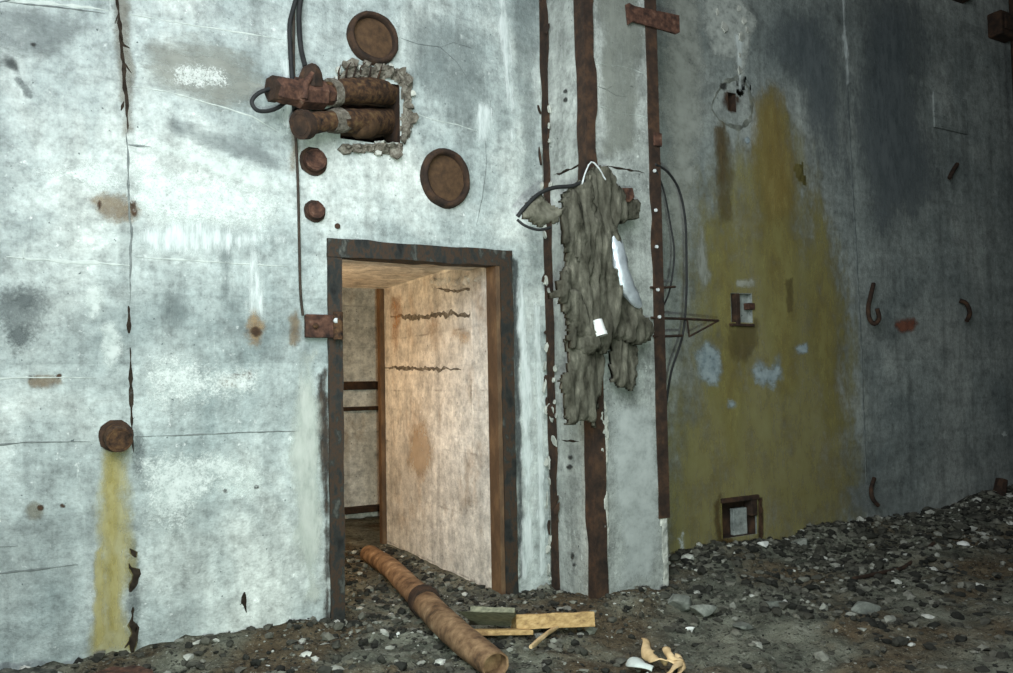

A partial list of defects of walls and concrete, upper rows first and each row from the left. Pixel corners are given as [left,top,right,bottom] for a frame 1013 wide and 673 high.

spalling [333,58,419,160]
water stain [599,0,640,155]
water stain [662,0,705,234]
rust [93,196,138,220]
crack [0,0,321,453]
rust [248,309,264,343]
crack [385,365,461,373]
crack [390,288,470,321]
peeling [542,330,557,447]
water stain [614,94,889,586]
water stain [136,440,264,528]
water stain [94,452,128,651]